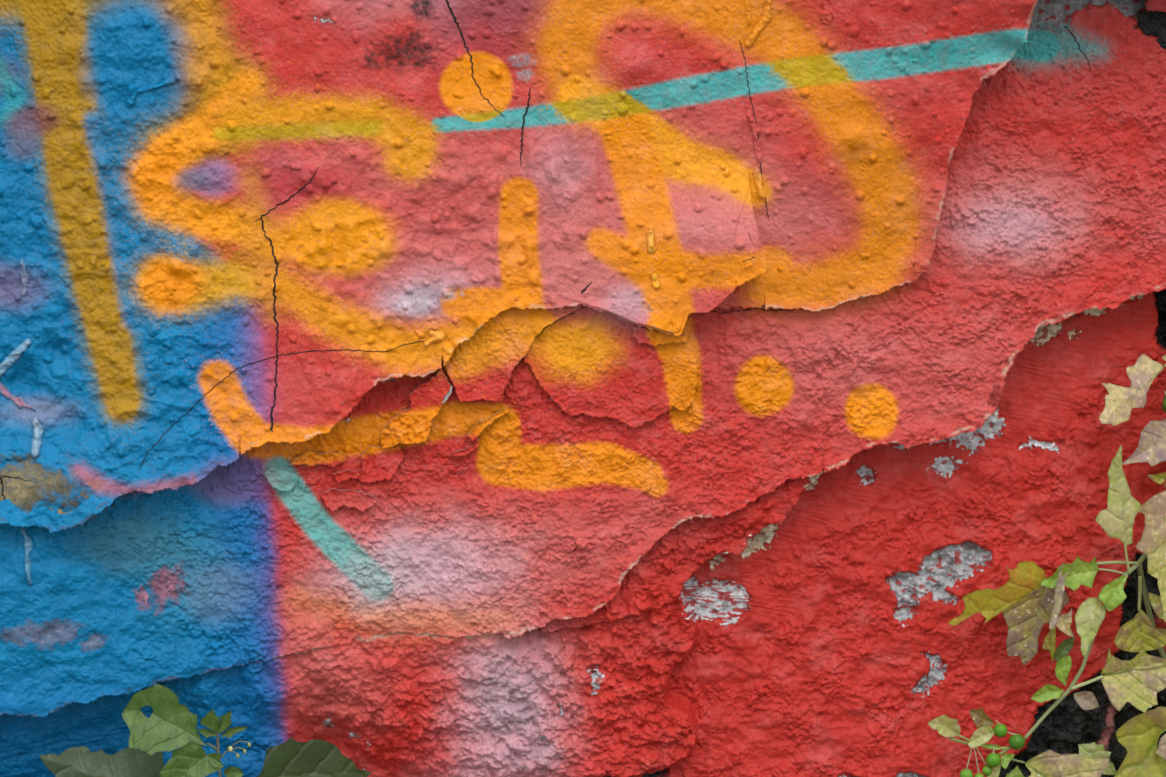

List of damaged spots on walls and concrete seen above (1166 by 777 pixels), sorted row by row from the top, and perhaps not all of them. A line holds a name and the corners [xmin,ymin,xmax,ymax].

crack [446,0,531,167]
peeling [765,0,1166,312]
crack [138,167,425,471]
peeling [0,190,767,533]
peeling [503,274,1166,639]
flaking render [587,666,605,695]
flaking render [630,767,671,777]
flaking render [911,651,947,699]
peeling [999,671,1166,777]
peeling [1114,649,1161,661]